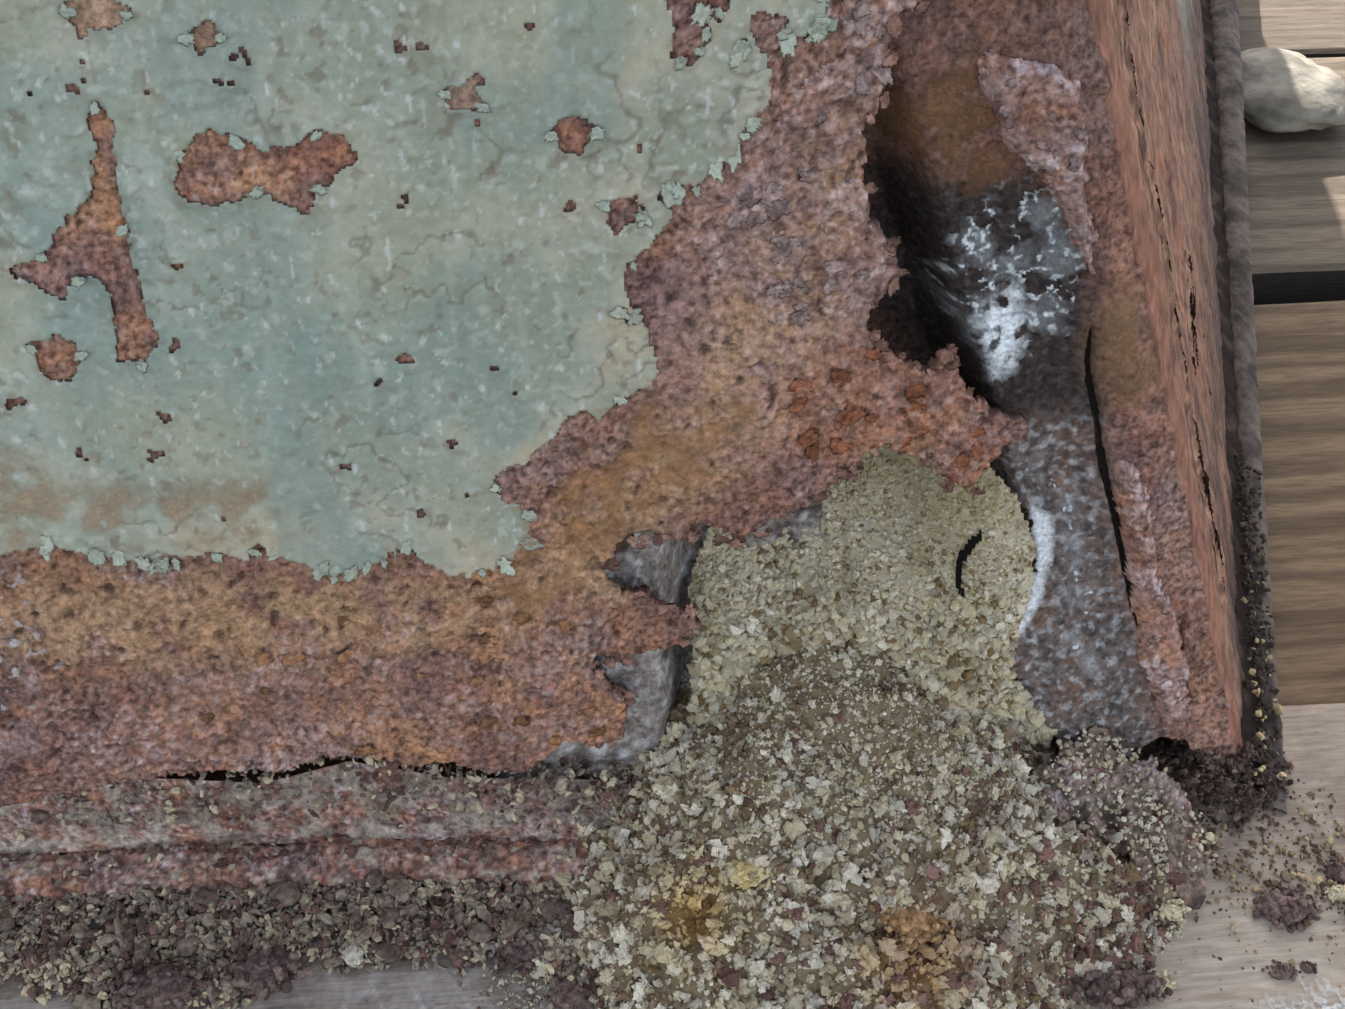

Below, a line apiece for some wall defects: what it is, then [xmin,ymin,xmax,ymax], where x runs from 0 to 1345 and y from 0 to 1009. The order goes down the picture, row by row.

peeling [11,101,159,381]
peeling [170,129,358,214]
peeling [544,116,605,155]
peeling [595,195,653,232]
peeling [660,116,762,209]
rust [726,181,869,327]
rust [855,11,904,126]
leakage [937,193,1080,376]
crack [1117,0,1228,614]
rust [788,370,880,508]
rust [864,329,987,498]
crack [1084,327,1137,623]